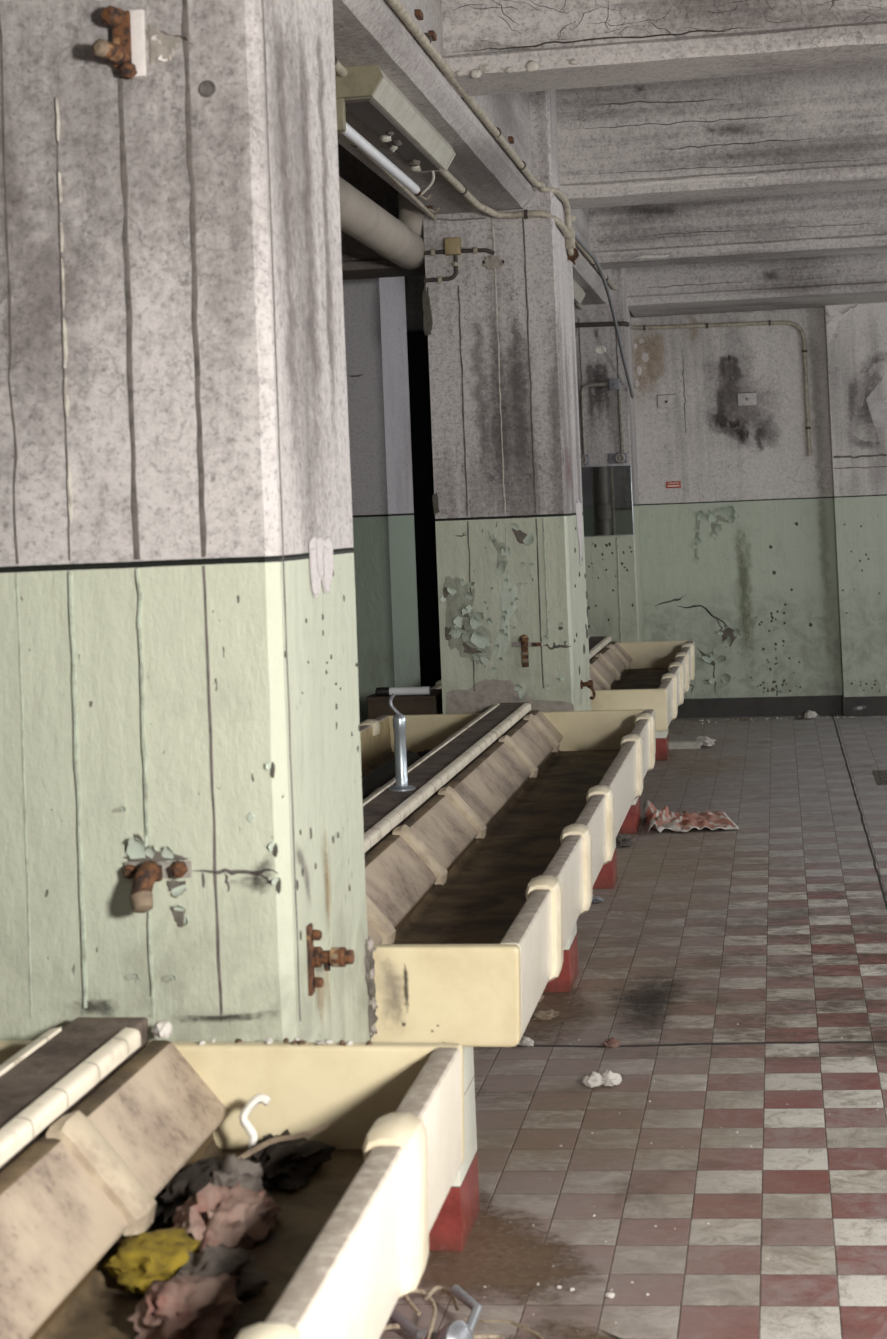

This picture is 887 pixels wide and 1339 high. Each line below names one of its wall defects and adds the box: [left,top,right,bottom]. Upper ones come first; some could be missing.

crack [453,0,886,43]
damp [716,358,768,446]
peeling [487,523,534,576]
peeling [692,505,735,562]
peeling [440,542,633,714]
crack [656,596,730,694]
peeling [123,834,189,862]
peeling [166,880,188,927]